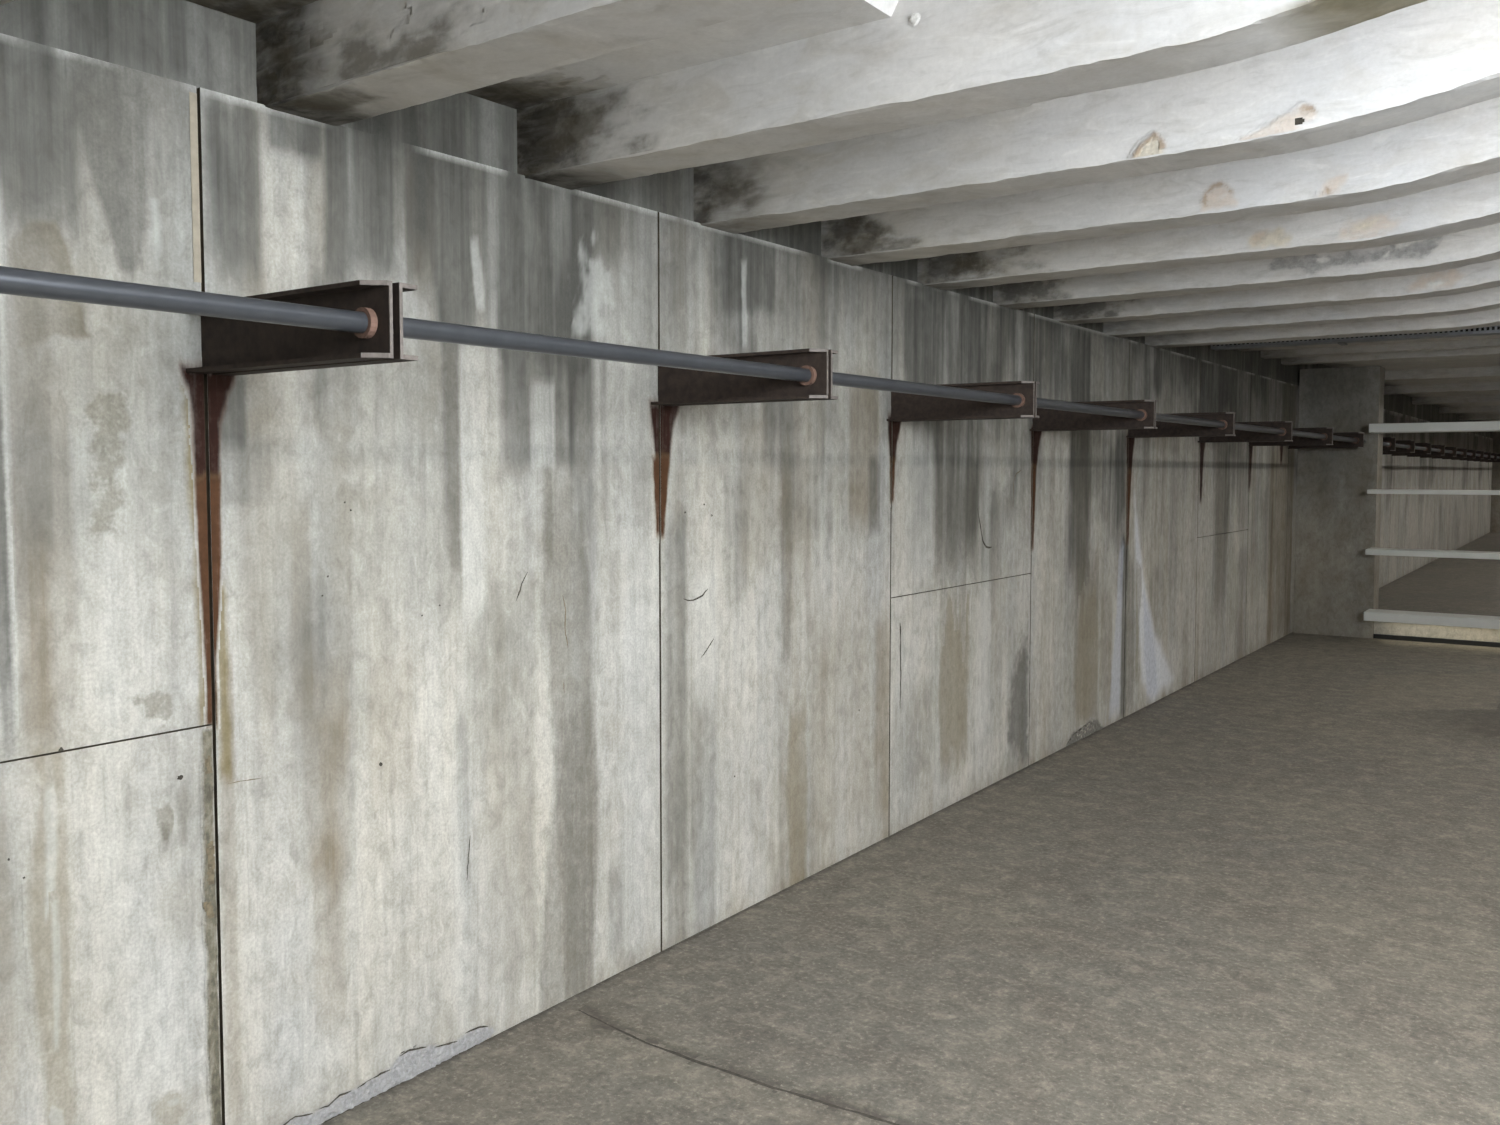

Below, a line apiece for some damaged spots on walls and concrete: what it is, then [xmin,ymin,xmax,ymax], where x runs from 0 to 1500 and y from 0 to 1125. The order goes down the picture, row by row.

leakage [187,0,490,117]
leakage [65,51,165,279]
leakage [465,67,663,176]
flaking render [1128,129,1168,159]
peeling [1245,203,1469,294]
corrosion [647,395,682,543]
corrosion [887,409,903,508]
corrosion [1030,419,1044,555]
corrosion [176,355,238,793]
leakage [1070,430,1176,738]
spalling [280,1023,497,1125]
crack [579,1002,933,1125]